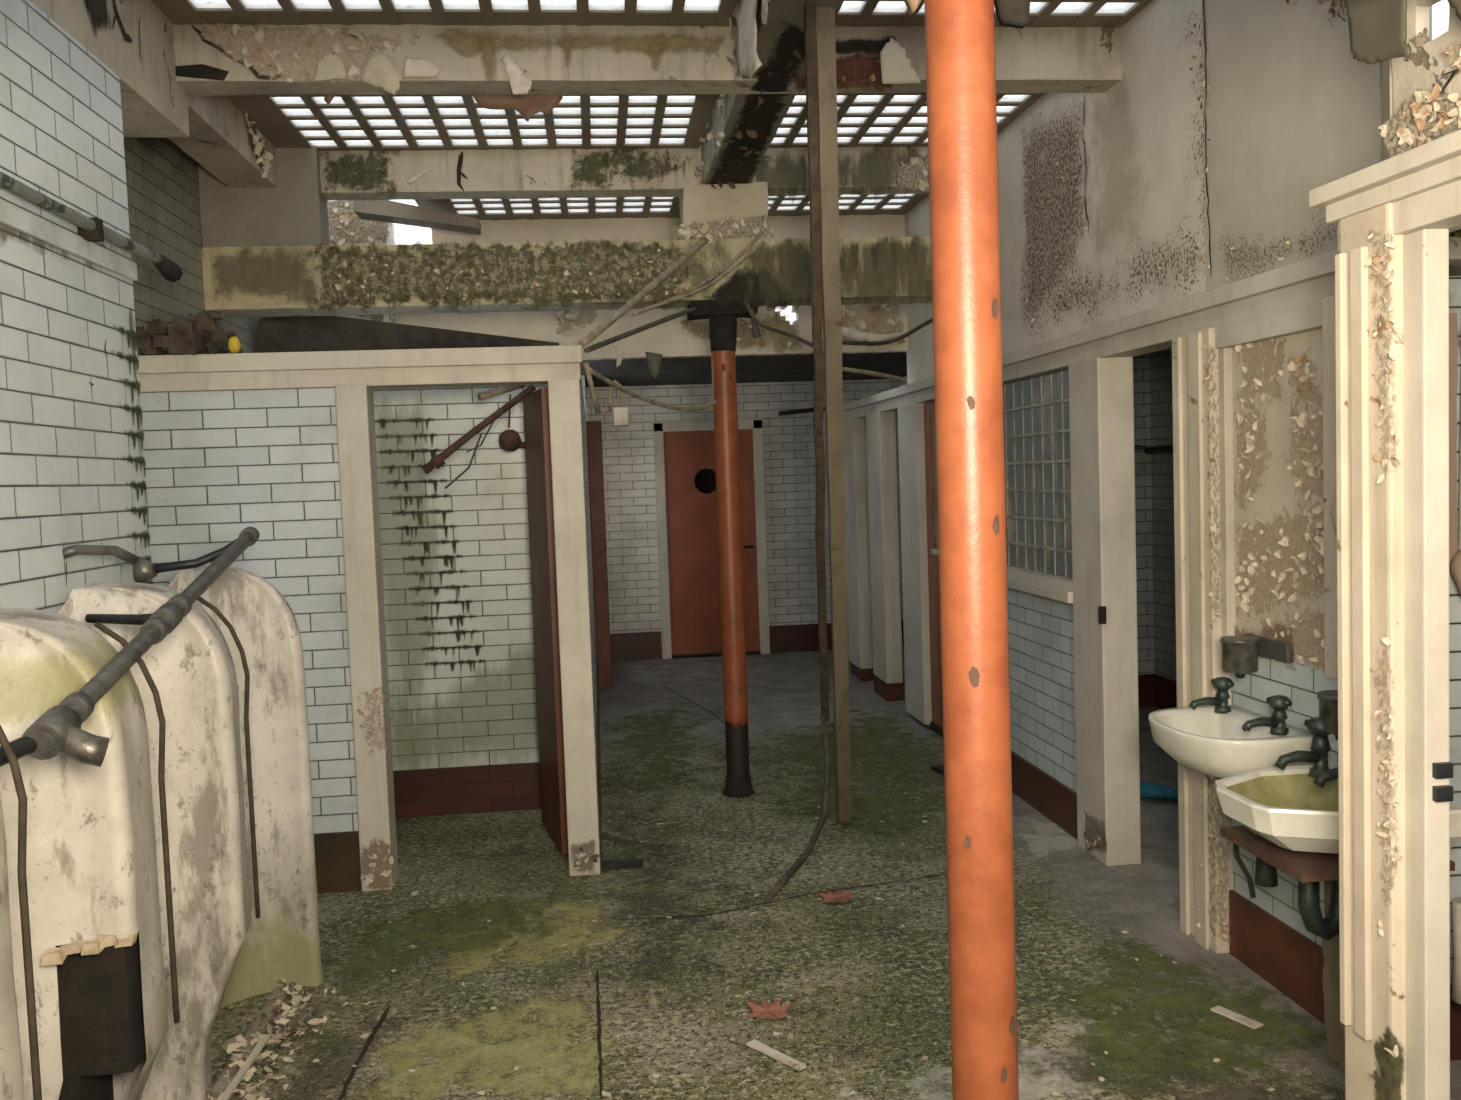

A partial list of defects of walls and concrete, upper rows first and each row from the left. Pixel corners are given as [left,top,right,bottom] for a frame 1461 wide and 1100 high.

peeling [175,23,418,83]
crack [1440,66,1459,95]
water stain [214,248,316,302]
peeling [1363,233,1396,372]
peeling [1370,397,1401,484]
water stain [375,418,484,671]
peeling [1204,337,1325,672]
peeling [360,838,395,889]